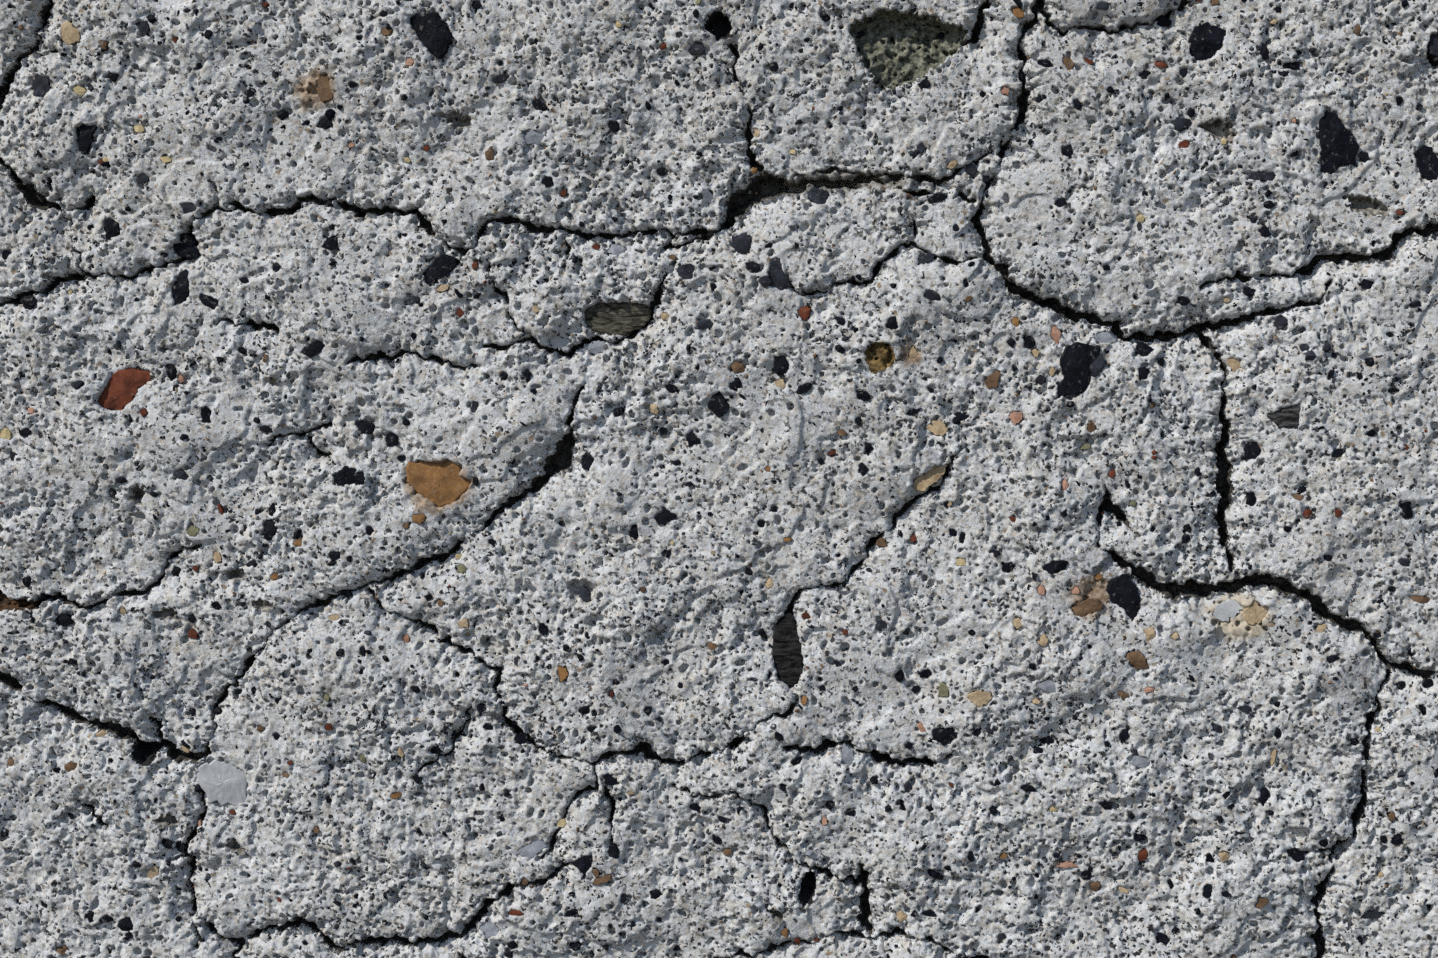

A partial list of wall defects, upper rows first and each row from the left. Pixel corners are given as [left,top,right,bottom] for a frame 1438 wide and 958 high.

crack [0,0,58,111]
crack [1426,50,1438,66]
crack [187,0,1191,262]
crack [0,157,189,306]
crack [218,319,280,332]
crack [347,349,478,370]
crack [483,261,677,359]
crack [792,178,1438,958]
crack [0,386,989,958]